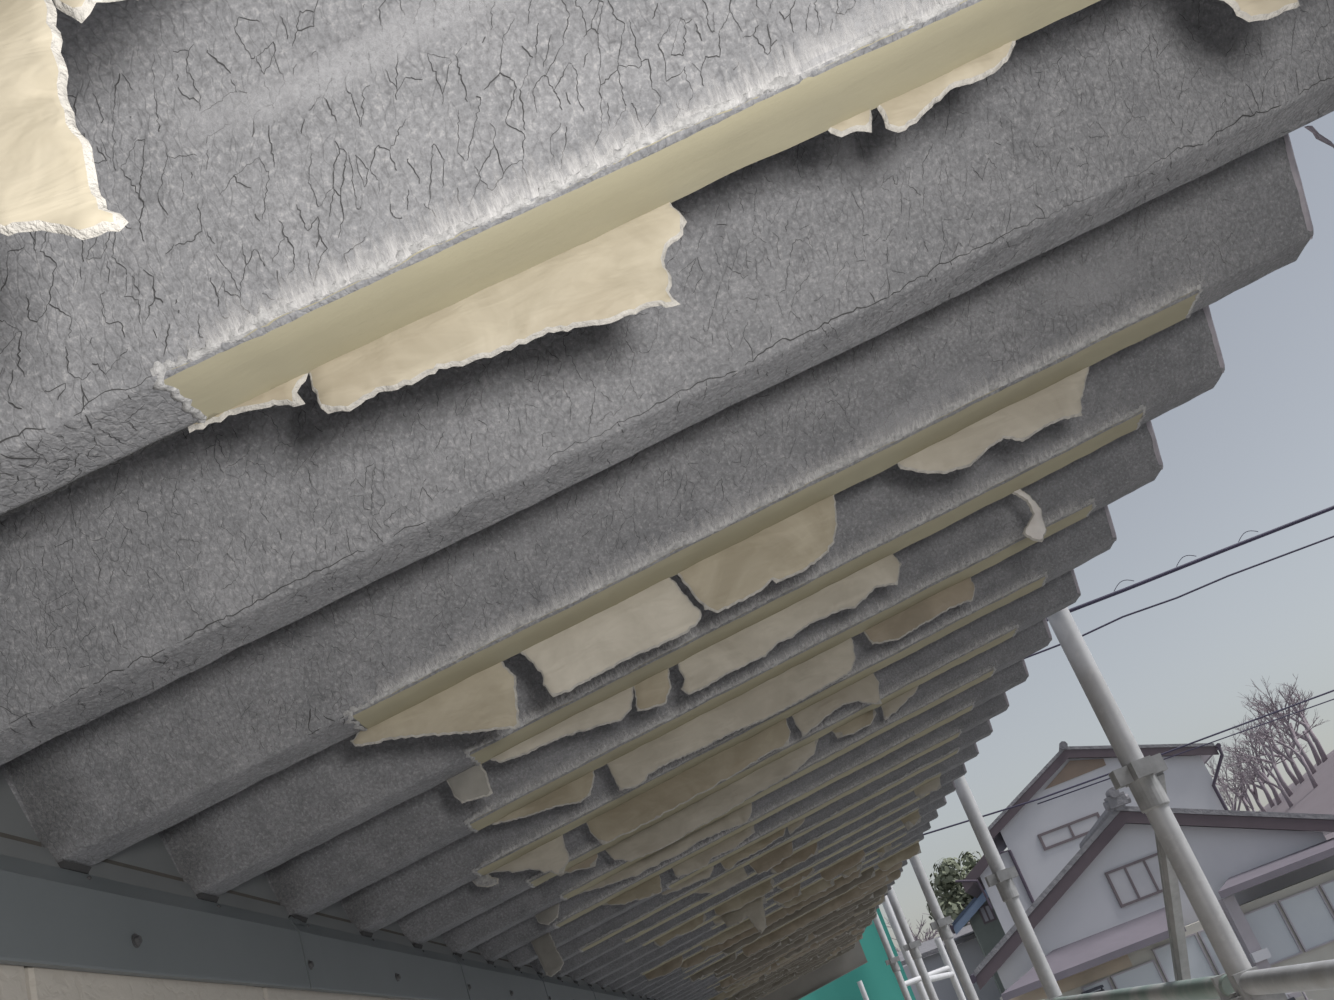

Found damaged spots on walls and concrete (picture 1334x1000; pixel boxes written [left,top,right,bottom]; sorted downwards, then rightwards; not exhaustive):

peeling [0,0,128,240]
peeling [149,0,1100,433]
crack [0,0,1334,762]
peeling [1222,0,1300,22]
peeling [343,283,1203,1000]